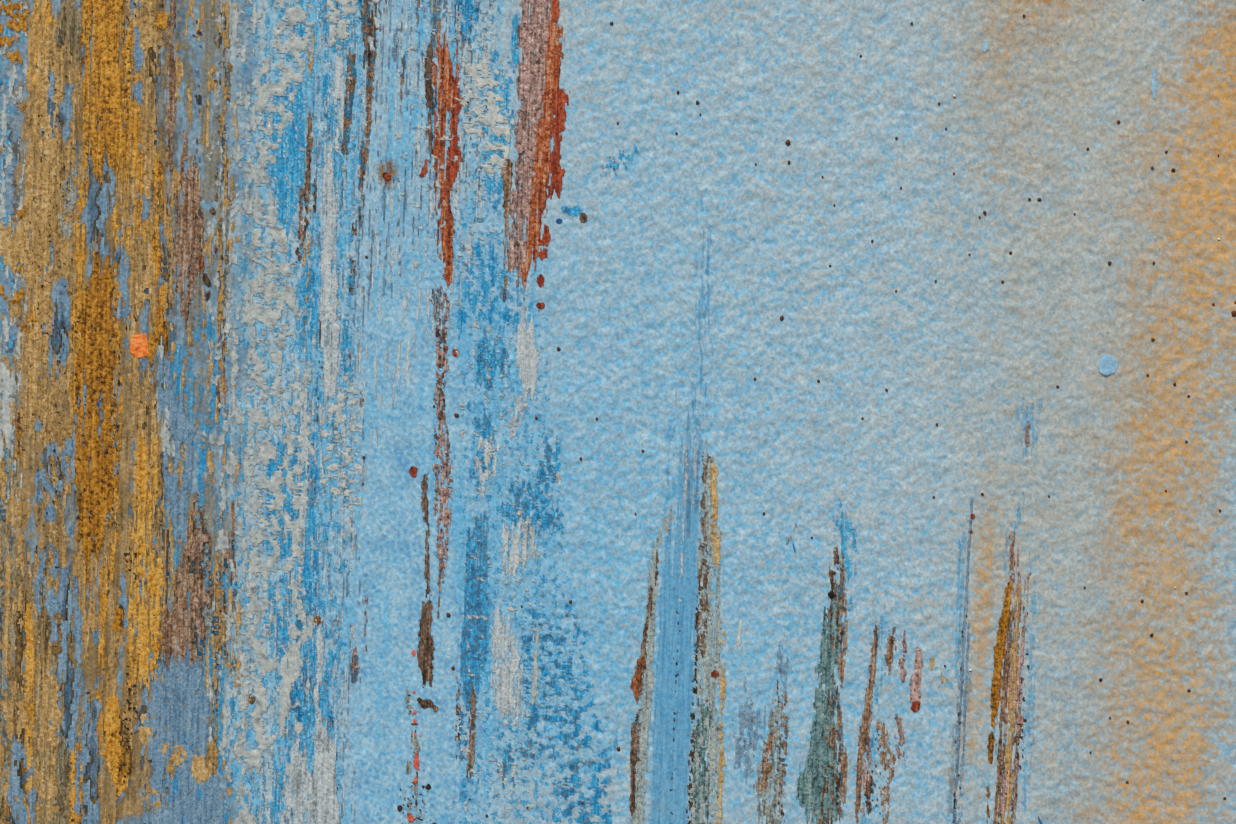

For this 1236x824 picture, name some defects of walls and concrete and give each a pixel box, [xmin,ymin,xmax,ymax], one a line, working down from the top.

peeling [0,0,31,64]
peeling [602,145,639,175]
peeling [0,206,32,274]
peeling [0,285,24,304]
peeling [0,333,23,461]
peeling [630,656,645,704]